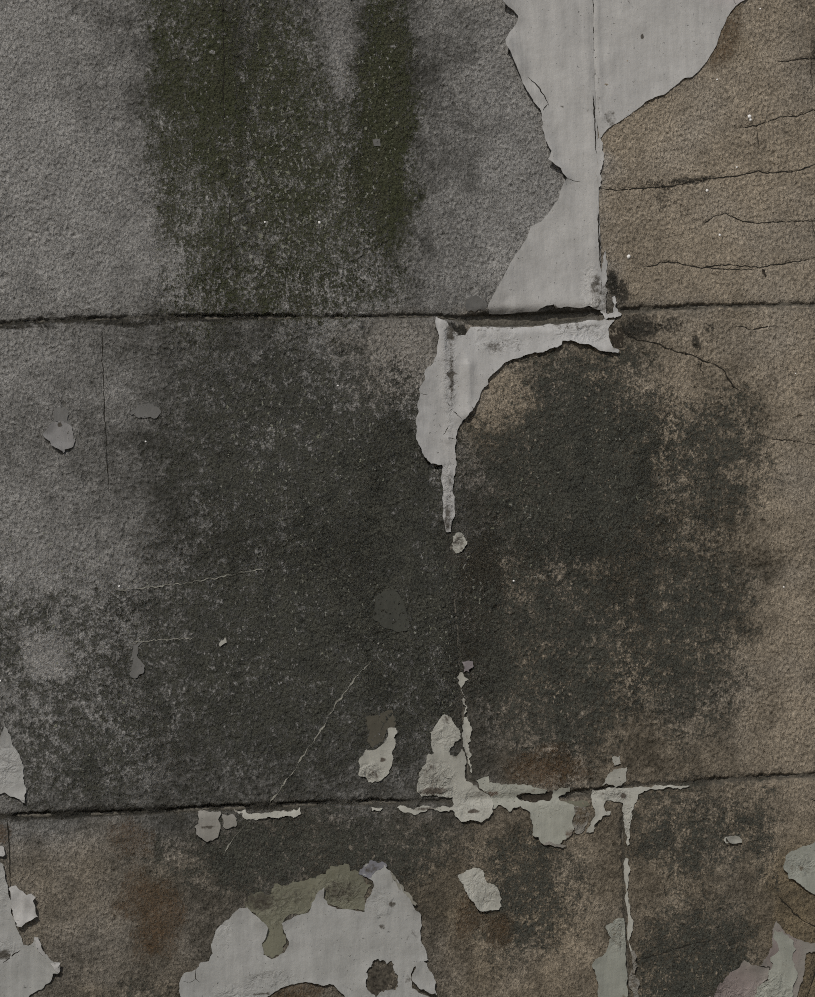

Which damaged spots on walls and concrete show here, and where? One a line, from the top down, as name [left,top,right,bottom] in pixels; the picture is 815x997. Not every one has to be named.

crack [591,3,599,153]
crack [740,58,814,144]
peeling [416,0,744,553]
crack [595,214,603,268]
crack [570,164,815,191]
crack [643,259,808,270]
leakage [0,0,776,808]
peeling [397,661,688,848]
peeling [0,846,60,997]
peeling [179,860,437,997]
peeling [458,868,502,912]
peeling [709,921,815,997]